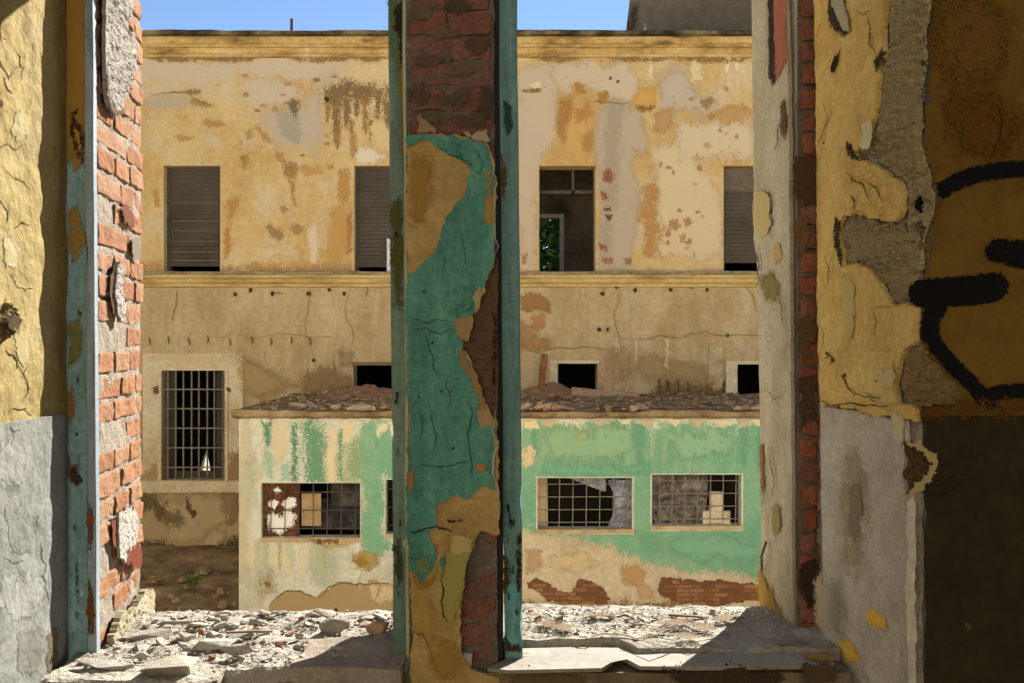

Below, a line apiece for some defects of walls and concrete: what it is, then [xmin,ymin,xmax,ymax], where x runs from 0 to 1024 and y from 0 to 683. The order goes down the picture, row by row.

crack [0,51,24,108]
water stain [221,57,389,272]
peeling [484,58,753,271]
peeling [827,0,850,38]
spalling [833,0,942,304]
peeling [112,419,473,628]
water stain [260,419,366,483]
water stain [376,421,393,437]
crack [409,315,499,517]
spalling [453,256,499,428]
spalling [637,569,782,617]
spalling [889,410,938,501]